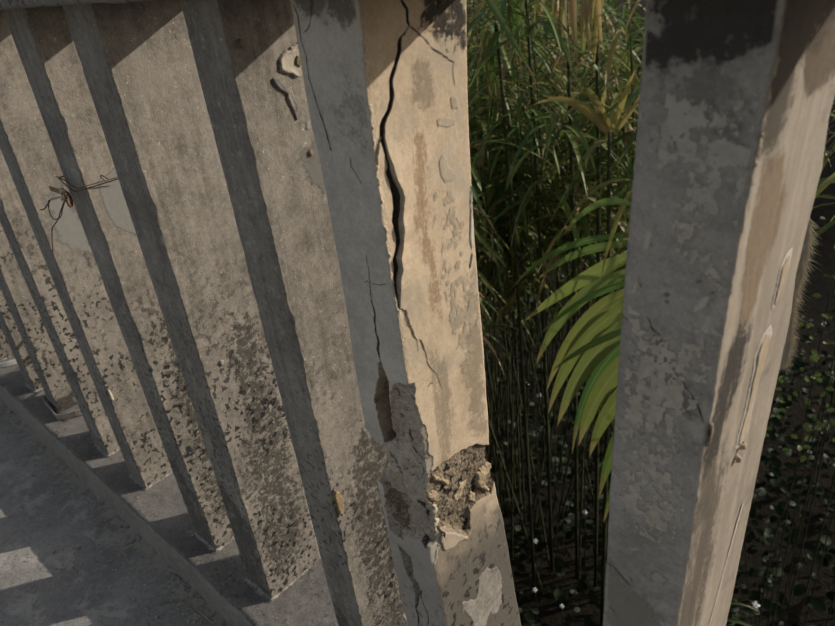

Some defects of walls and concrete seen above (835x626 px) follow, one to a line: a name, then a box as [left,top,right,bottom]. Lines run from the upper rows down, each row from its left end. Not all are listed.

flaking render [273,44,312,130]
crack [293,4,331,151]
crack [365,0,455,389]
peeling [645,91,766,215]
peeling [619,306,714,452]
spalling [374,362,494,609]
peeling [461,567,502,626]